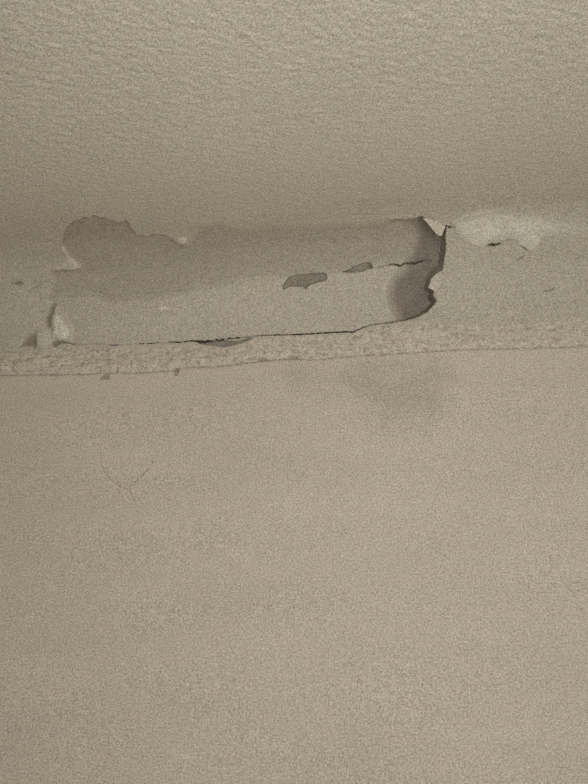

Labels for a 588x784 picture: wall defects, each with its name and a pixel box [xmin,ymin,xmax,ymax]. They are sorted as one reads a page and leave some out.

flaking render [46,215,451,345]
spalling [18,329,38,350]
crack [139,319,407,347]